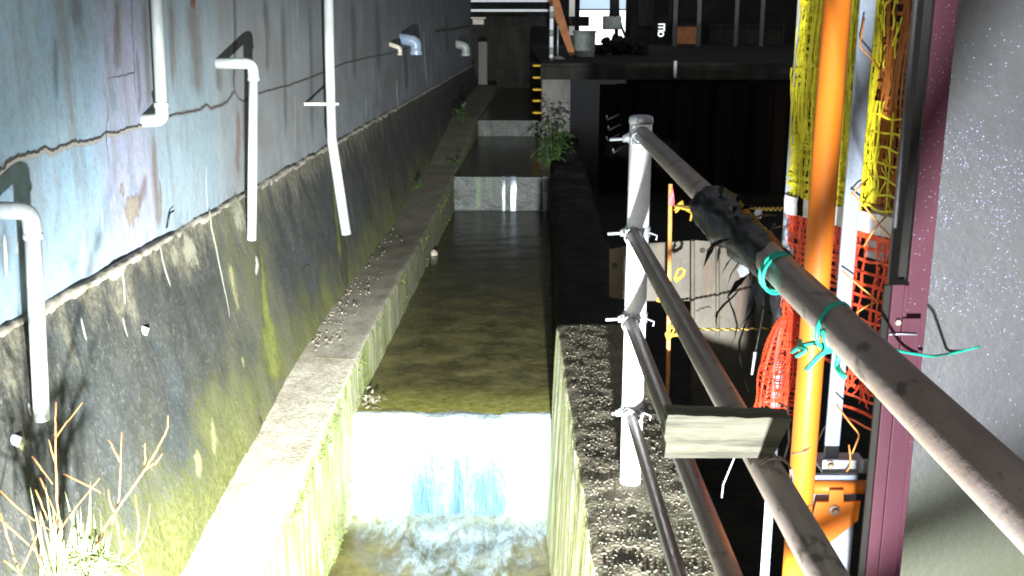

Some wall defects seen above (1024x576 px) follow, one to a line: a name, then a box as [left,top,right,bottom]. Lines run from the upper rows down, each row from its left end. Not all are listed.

crack [0,18,143,177]
crack [169,0,408,117]
peeling [120,183,141,227]